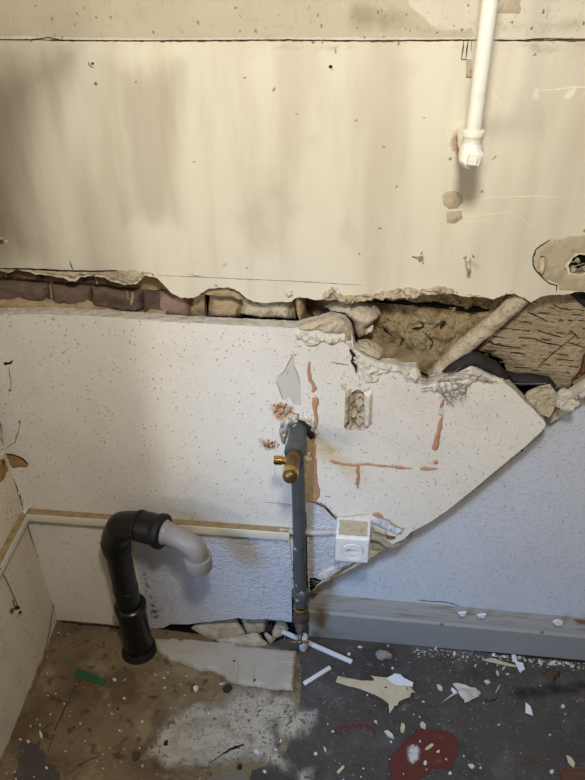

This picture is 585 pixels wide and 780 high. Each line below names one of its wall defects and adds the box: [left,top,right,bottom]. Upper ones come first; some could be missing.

peeling [498,0,521,14]
peeling [442,191,463,224]
peeling [532,235,585,292]
flaking render [0,267,508,398]
flaking render [525,384,574,417]
flaking render [279,410,319,444]
peeling [0,454,28,482]
flaking render [156,597,296,646]